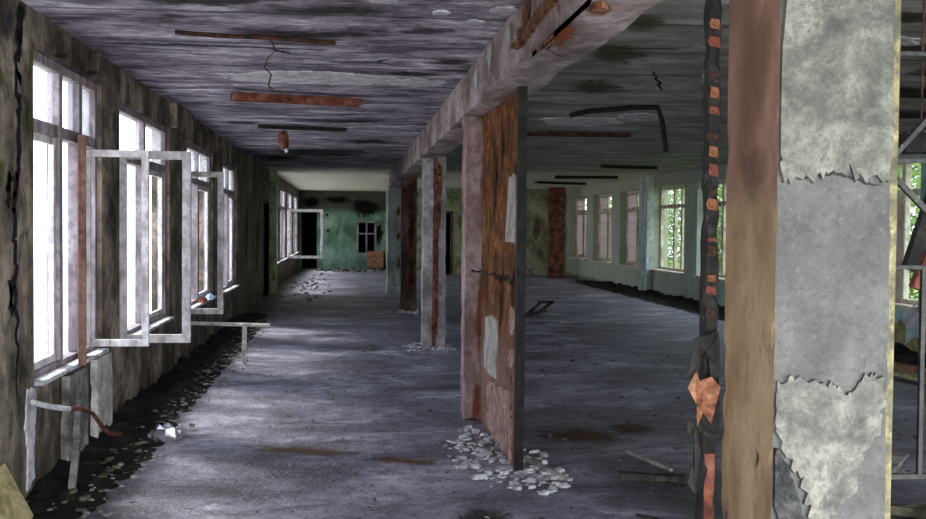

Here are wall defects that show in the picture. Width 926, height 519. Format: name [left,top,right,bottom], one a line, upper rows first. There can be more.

crack [5,6,24,401]
peeling [505,168,517,246]
peeling [484,306,515,460]
spalling [772,372,887,519]